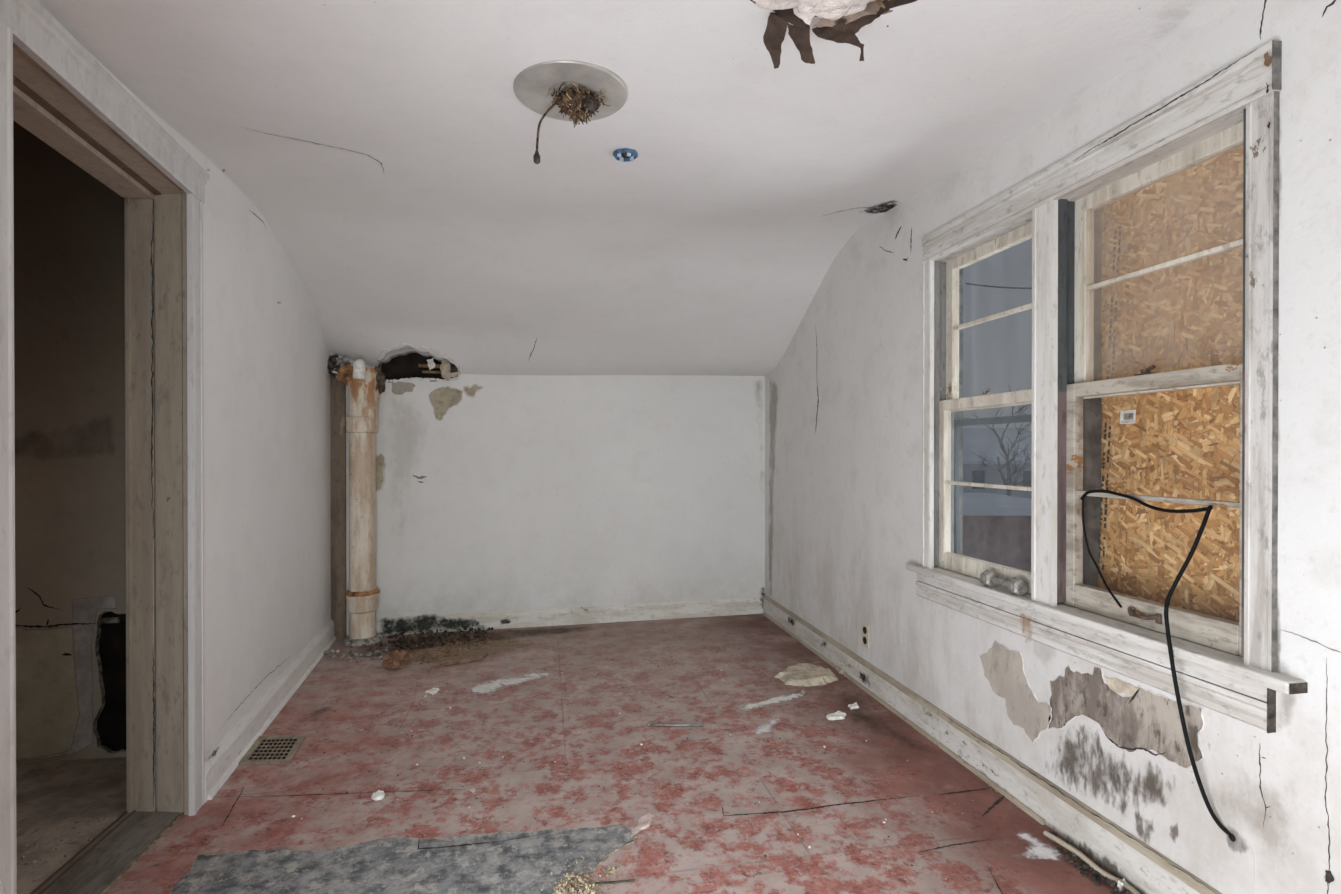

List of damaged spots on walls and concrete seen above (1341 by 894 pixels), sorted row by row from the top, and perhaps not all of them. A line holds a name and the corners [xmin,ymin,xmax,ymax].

spalling [879,0,917,11]
crack [247,128,385,174]
flaking render [372,342,483,421]
crack [15,587,96,628]
corrosion [345,588,380,597]
flaking render [93,611,126,754]
flaking render [980,639,1205,770]
damp [1059,728,1164,841]
crack [1283,630,1341,894]